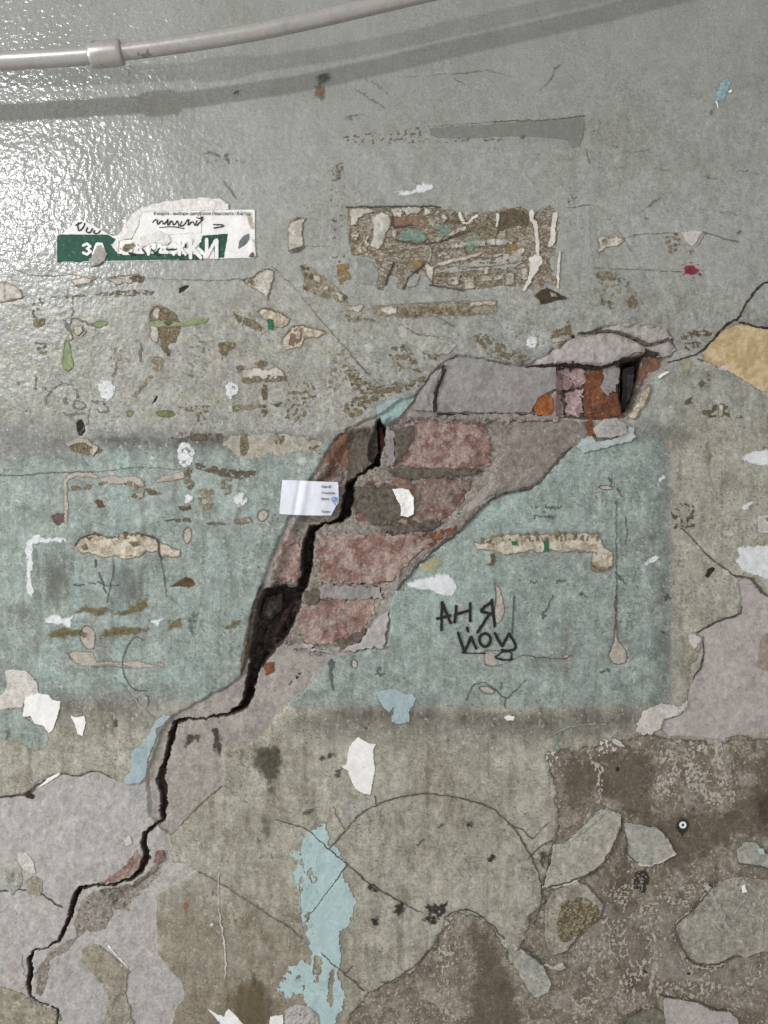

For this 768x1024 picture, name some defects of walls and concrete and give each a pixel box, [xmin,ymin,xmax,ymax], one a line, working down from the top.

crack [433,364,444,413]
crack [667,281,768,363]
crack [0,418,554,1024]
spalling [0,339,674,1024]
peeling [348,578,768,1024]